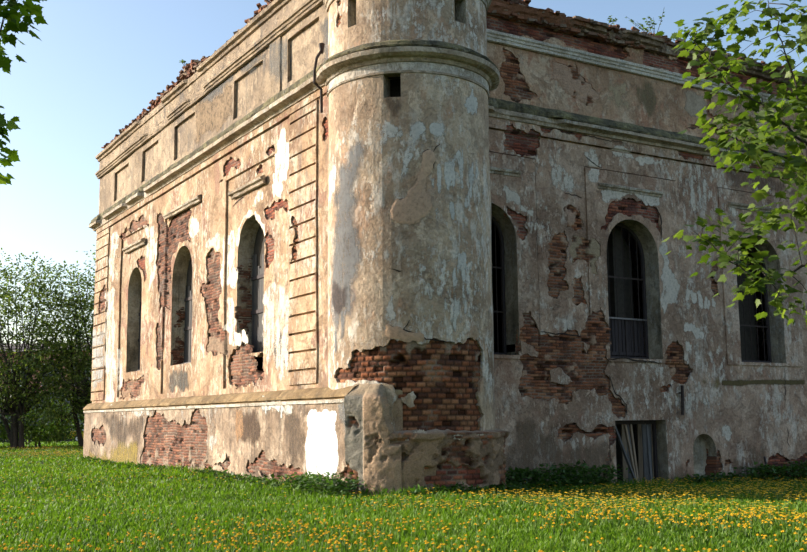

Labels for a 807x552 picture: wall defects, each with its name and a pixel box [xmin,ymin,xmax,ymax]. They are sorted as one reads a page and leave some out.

spalling [486,0,793,103]
spalling [503,124,586,157]
spalling [92,208,199,402]
spalling [201,128,301,387]
leakage [329,142,363,351]
spalling [547,205,600,306]
spalling [584,149,719,314]
spalling [92,426,106,445]
spalling [141,409,231,470]
spalling [337,338,481,431]
spalling [515,310,626,469]
spalling [659,322,705,392]